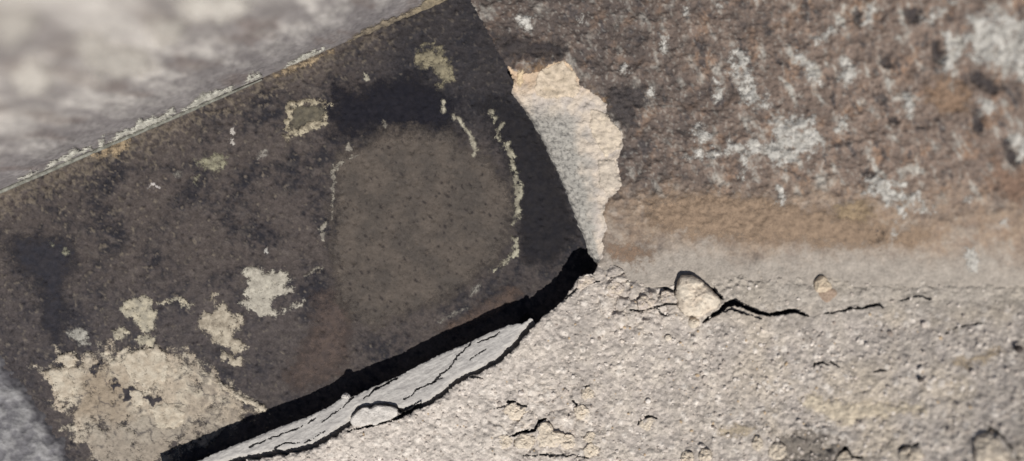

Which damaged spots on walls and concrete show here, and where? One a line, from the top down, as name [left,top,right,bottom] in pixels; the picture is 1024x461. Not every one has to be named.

damp [284,46,330,68]
damp [290,105,325,129]
damp [441,100,479,157]
damp [318,142,356,241]
damp [488,109,524,272]
spalling [508,61,624,263]
crack [629,287,677,316]
crack [702,287,932,323]
peeling [33,267,303,461]